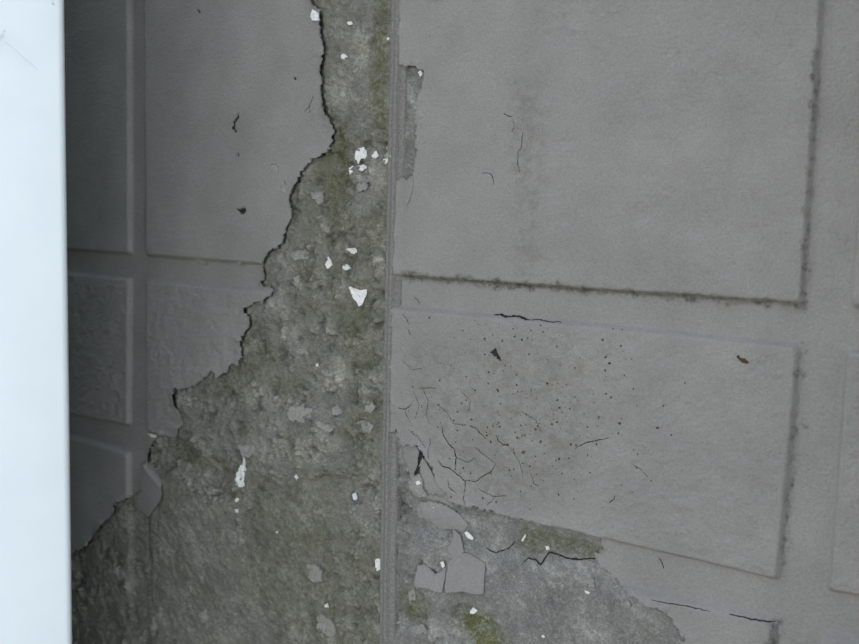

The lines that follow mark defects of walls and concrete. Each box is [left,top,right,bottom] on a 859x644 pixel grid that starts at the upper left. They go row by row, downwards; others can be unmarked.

peeling [71,0,685,644]
crack [399,364,538,505]
crack [487,542,596,566]